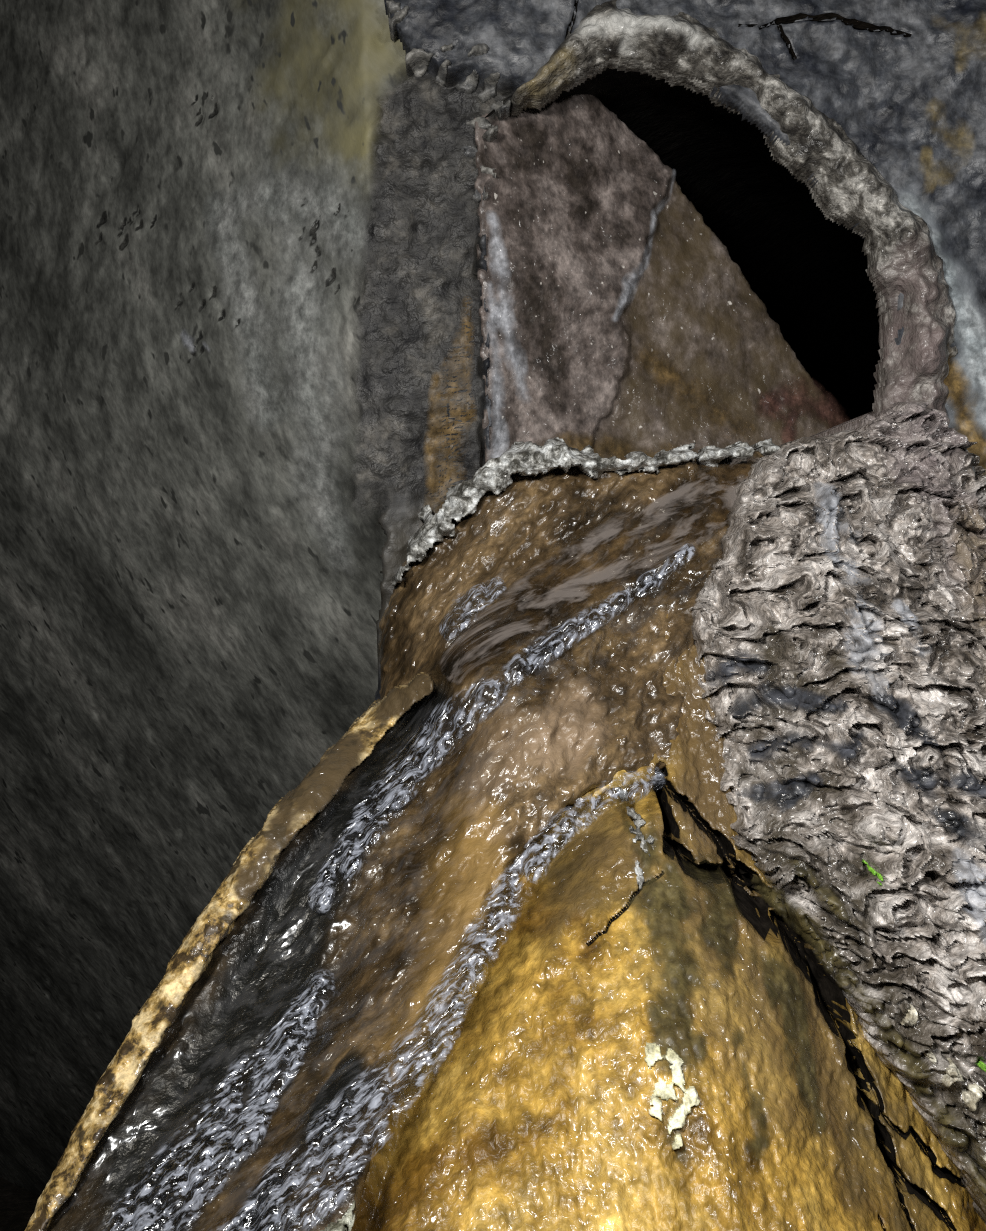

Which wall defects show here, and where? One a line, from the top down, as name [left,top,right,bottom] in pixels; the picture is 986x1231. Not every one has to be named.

crack [738,13,912,60]
efflorescence [930,233,986,403]
efflorescence [615,787,654,889]
leakage [688,860,737,972]
crack [587,767,964,1231]
efflorescence [644,1042,700,1150]
leakage [744,1068,769,1155]
efflorescence [320,1201,355,1231]